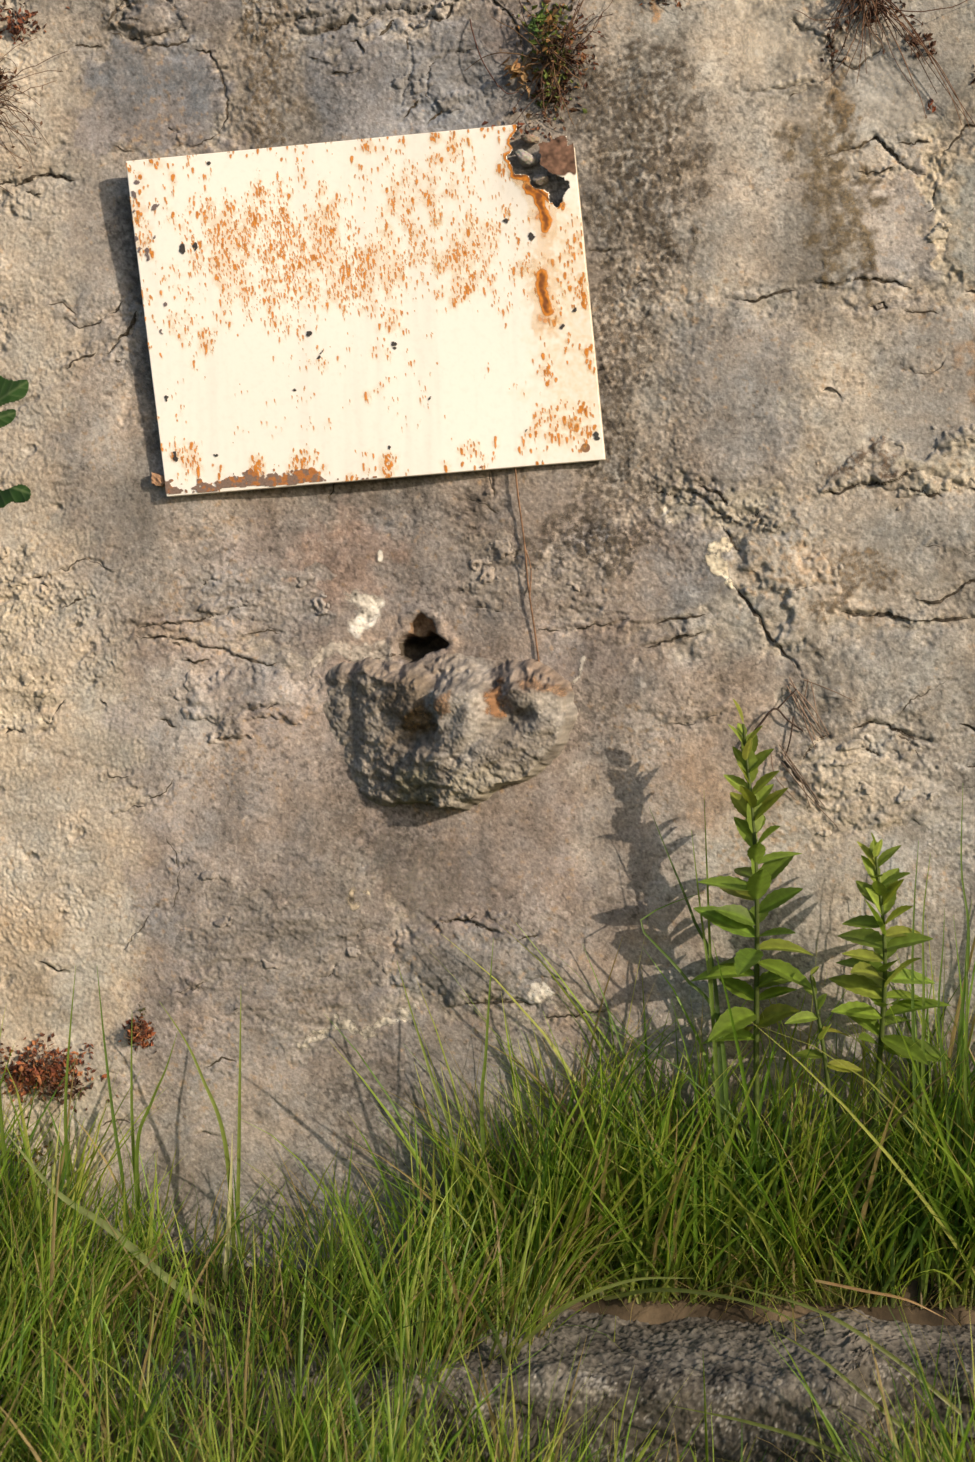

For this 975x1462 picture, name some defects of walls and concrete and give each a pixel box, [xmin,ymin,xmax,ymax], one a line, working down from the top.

crack [75,0,229,150]
rust [126,124,597,465]
crack [736,277,938,314]
rust [161,438,222,492]
rust [251,418,409,481]
rust [444,436,497,473]
crack [654,485,816,677]
crack [841,544,975,622]
crack [537,614,705,648]